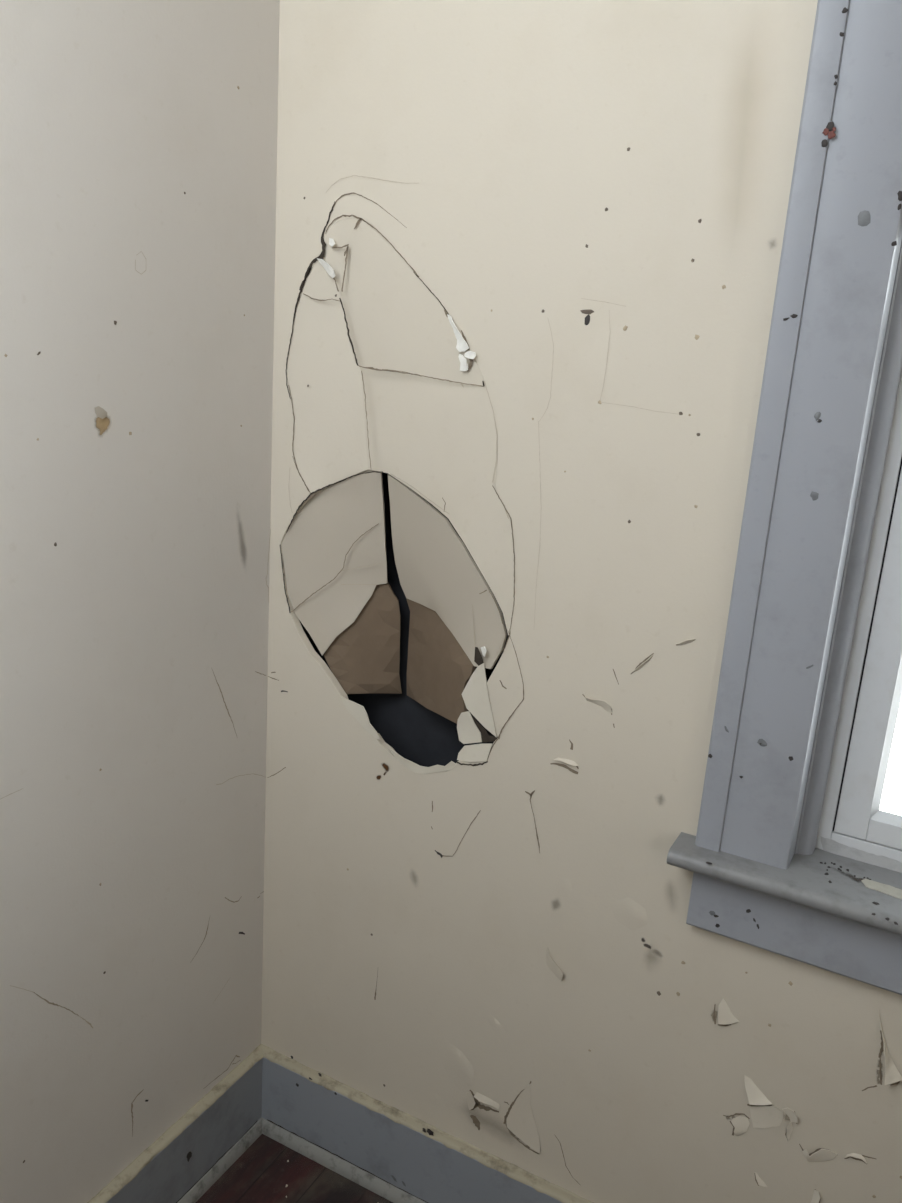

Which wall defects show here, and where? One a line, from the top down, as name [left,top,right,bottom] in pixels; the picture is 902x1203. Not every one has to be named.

spalling [280,218,515,774]
crack [266,192,554,766]
peeling [712,998,739,1026]
peeling [862,1009,902,1091]
peeling [723,1076,783,1136]